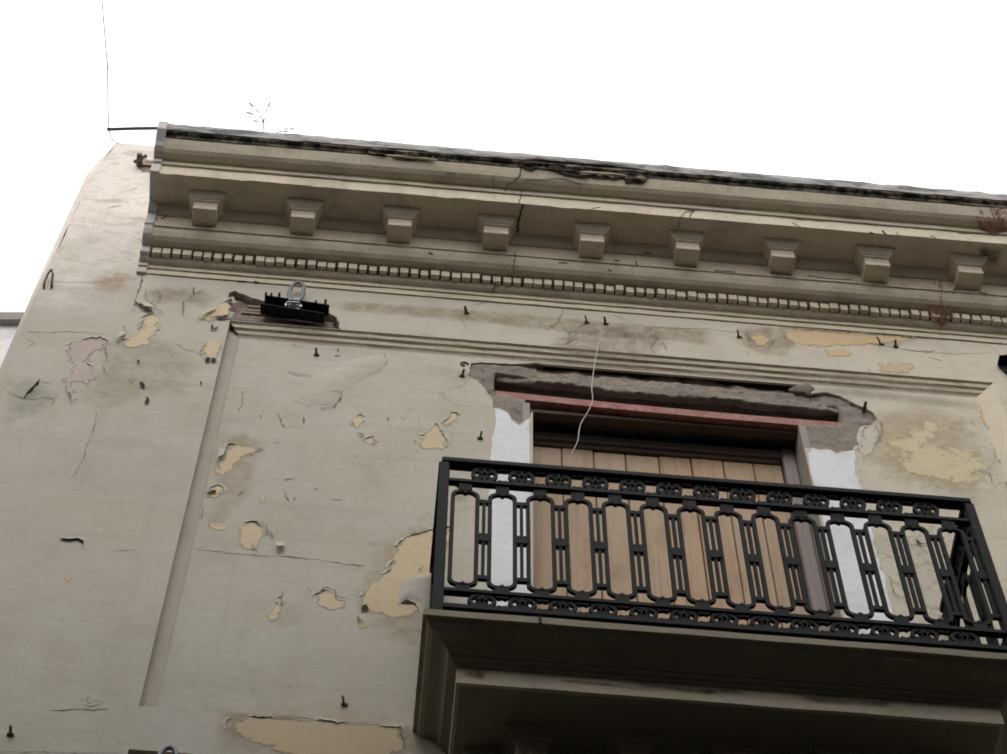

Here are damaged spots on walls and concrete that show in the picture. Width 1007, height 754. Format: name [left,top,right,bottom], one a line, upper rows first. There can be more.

crack [460,163,581,320]
peeling [62,289,163,402]
flaking render [199,296,335,362]
peeling [738,327,916,356]
peeling [414,409,462,449]
flaking render [468,364,996,484]
peeling [205,441,265,498]
peeling [237,520,284,550]
peeling [357,528,433,628]
peeling [221,714,408,754]